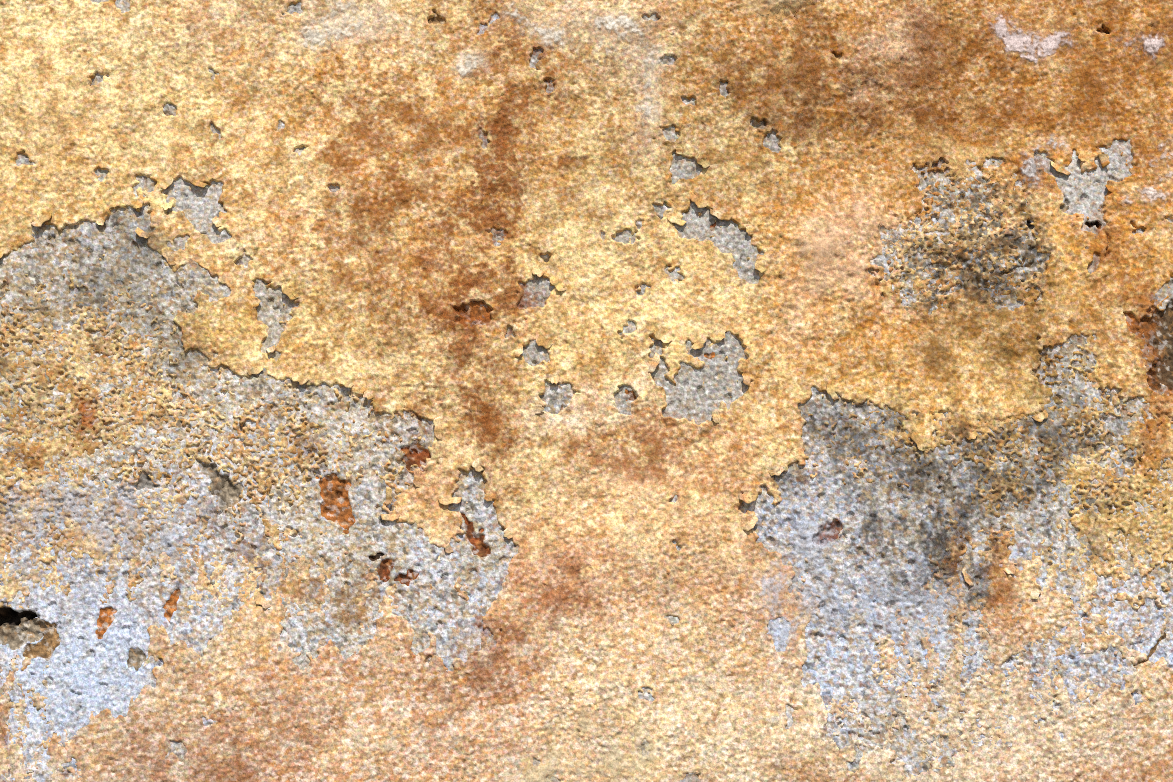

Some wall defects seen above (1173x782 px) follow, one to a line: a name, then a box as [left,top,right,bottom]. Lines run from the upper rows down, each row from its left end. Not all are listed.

peeling [163,103,177,116]
rust [419,238,481,324]
rust [462,207,510,228]
rust [474,108,524,193]
peeling [601,221,642,244]
peeling [652,126,766,284]
peeling [868,158,1050,315]
peeling [1034,139,1133,236]
peeling [614,385,638,416]
peeling [648,327,751,425]
peeling [0,175,519,782]
peeling [738,277,1173,778]